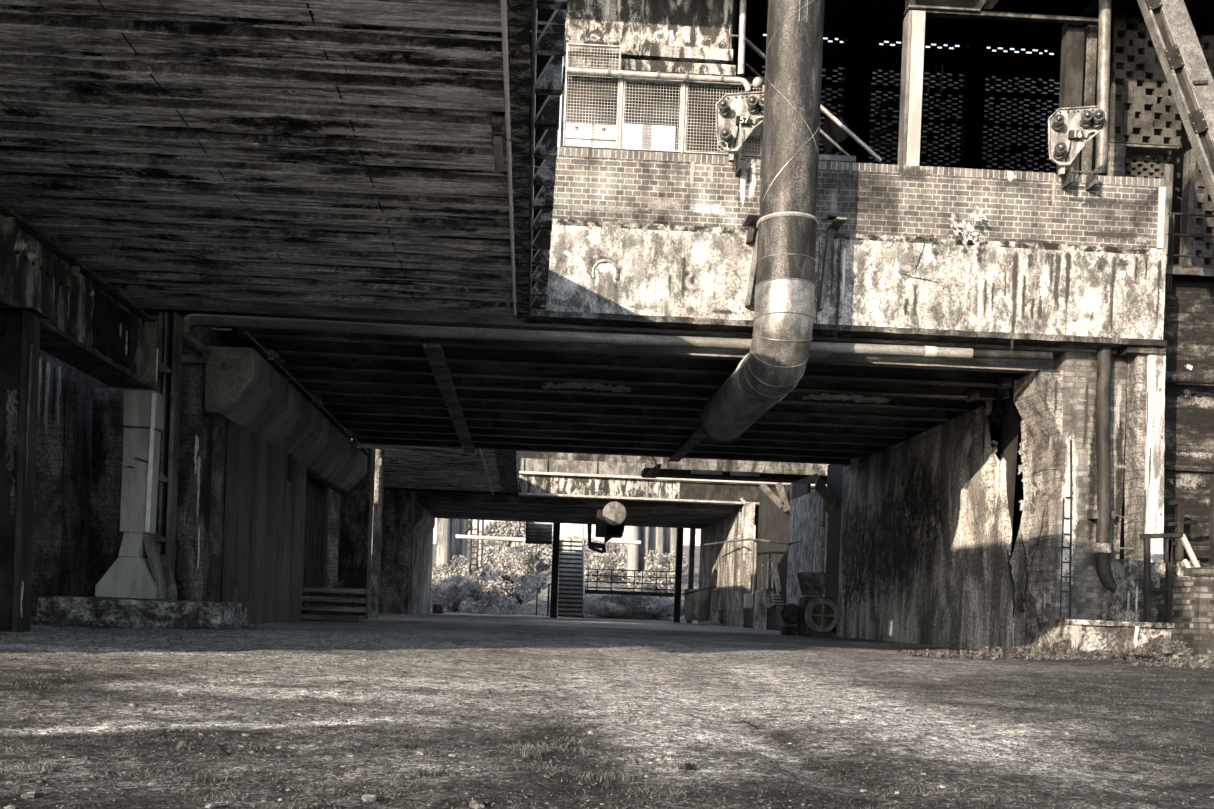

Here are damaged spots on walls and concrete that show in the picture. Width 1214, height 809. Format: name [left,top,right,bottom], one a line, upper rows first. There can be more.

leakage [606,0,621,17]
leakage [669,26,690,41]
leakage [1052,177,1146,207]
leakage [841,248,913,281]
leakage [903,284,917,316]
leakage [965,230,1162,355]
crack [1007,506,1055,618]